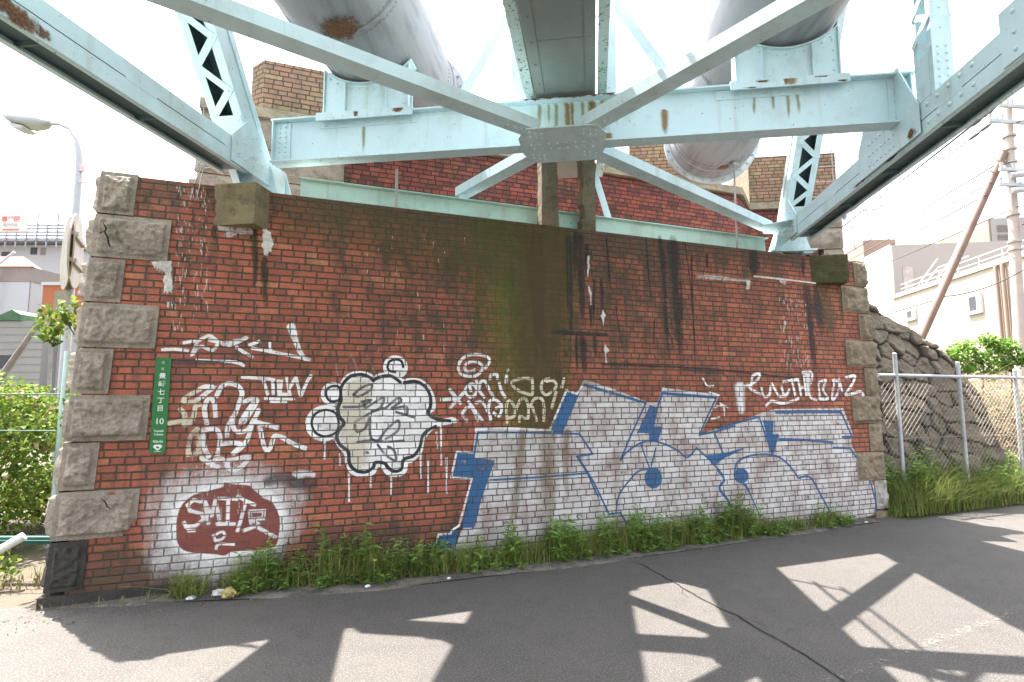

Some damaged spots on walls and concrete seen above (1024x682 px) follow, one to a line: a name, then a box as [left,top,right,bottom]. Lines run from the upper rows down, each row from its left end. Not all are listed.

corrosion [0,0,50,41]
corrosion [321,16,358,40]
corrosion [523,92,614,126]
leakage [151,187,274,330]
leakage [552,232,828,380]